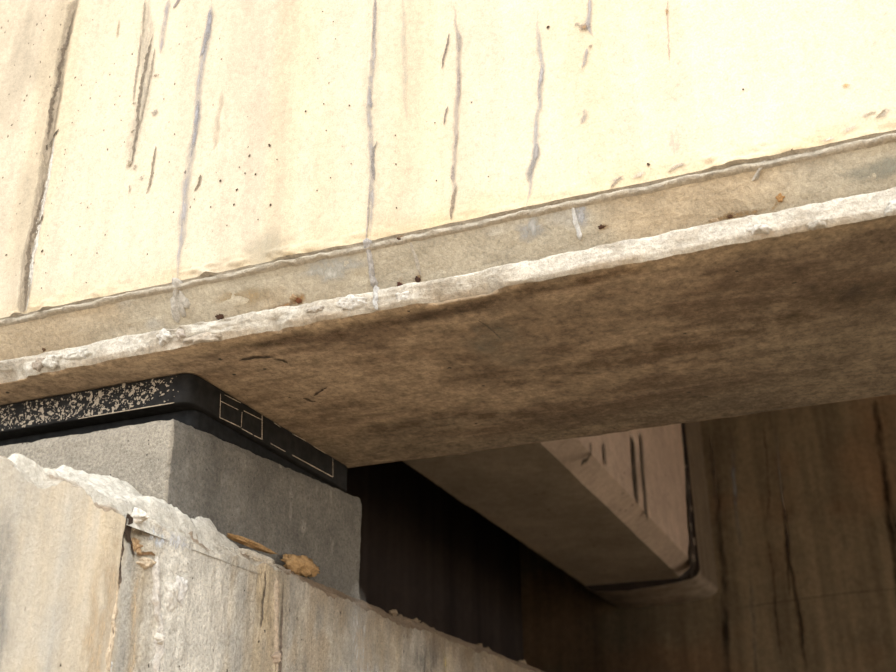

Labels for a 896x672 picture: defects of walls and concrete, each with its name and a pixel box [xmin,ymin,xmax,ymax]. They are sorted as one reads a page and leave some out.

water stain [442,23,460,218]
crack [105,514,128,672]
spalling [0,456,544,672]
water stain [882,461,896,579]